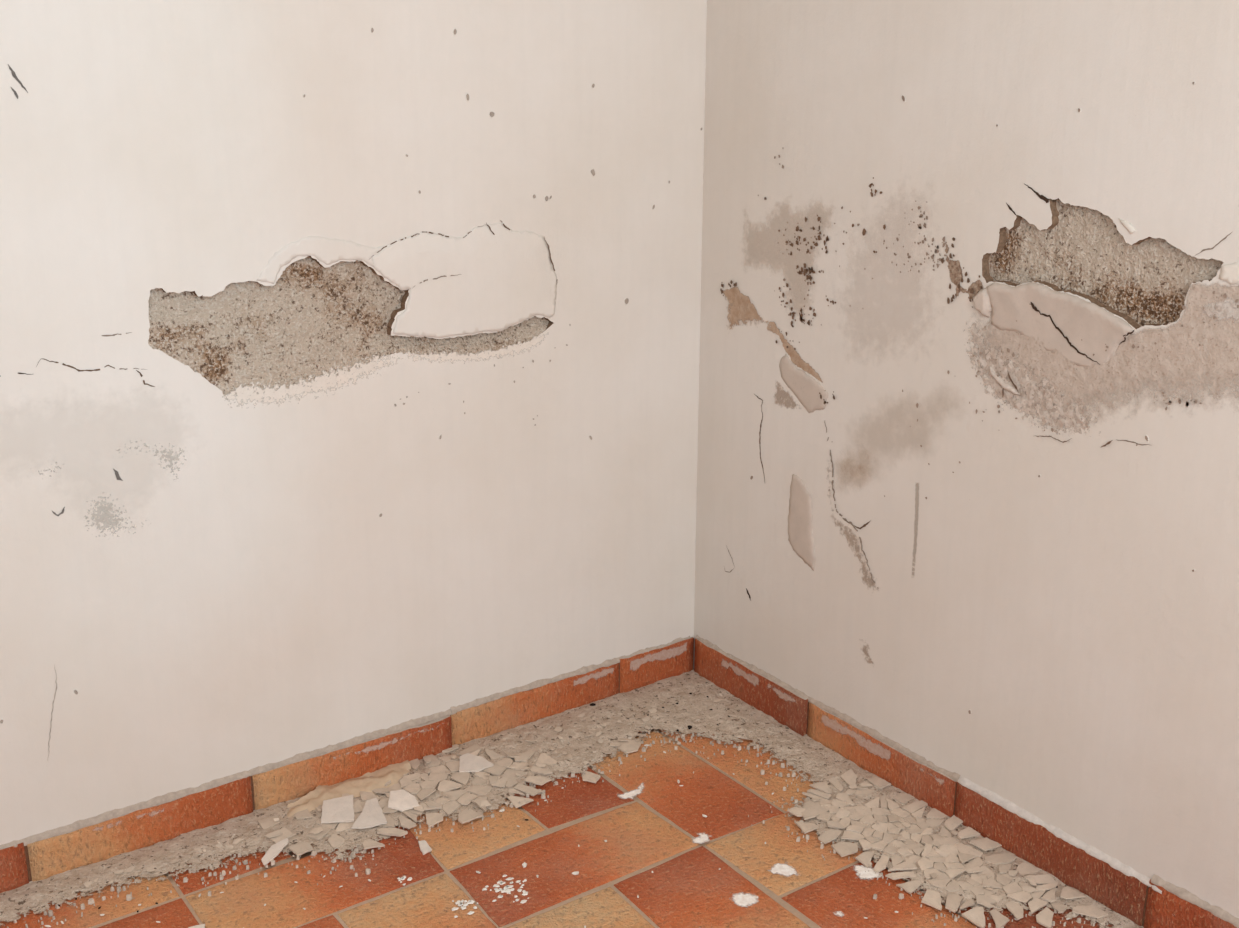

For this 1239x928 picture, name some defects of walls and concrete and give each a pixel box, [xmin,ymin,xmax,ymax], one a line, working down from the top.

spalling [148,236,549,408]
crack [18,332,155,387]
peeling [720,206,879,589]
peeling [581,771,601,783]
peeling [352,798,387,829]